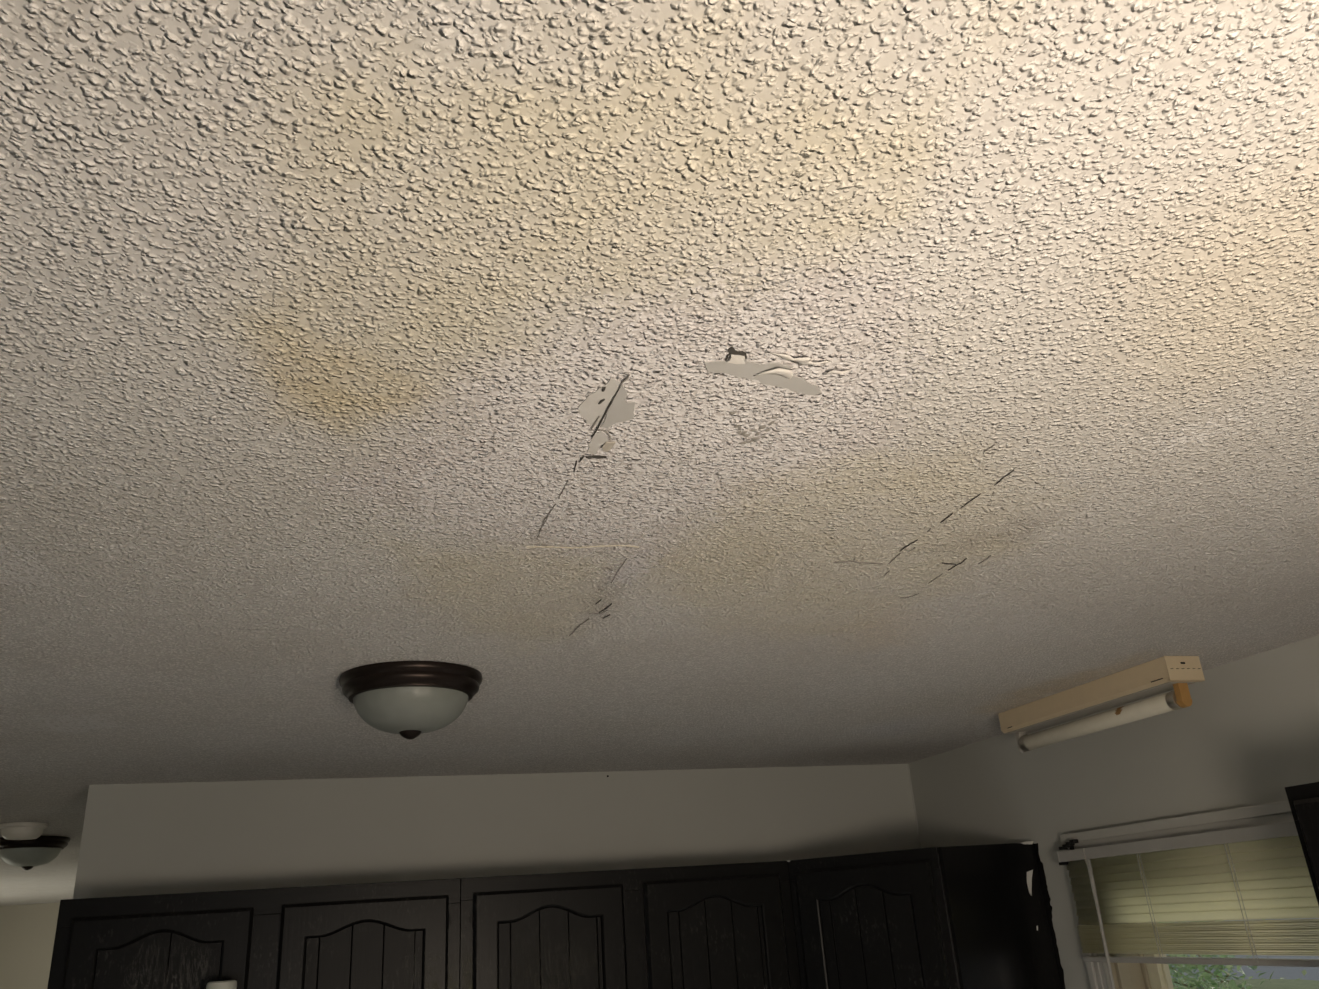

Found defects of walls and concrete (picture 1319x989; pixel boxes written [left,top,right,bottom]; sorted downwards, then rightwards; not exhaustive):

peeling [704,346,851,395]
peeling [578,374,635,455]
spalling [730,411,779,444]
crack [526,455,639,549]
crack [834,444,1014,598]